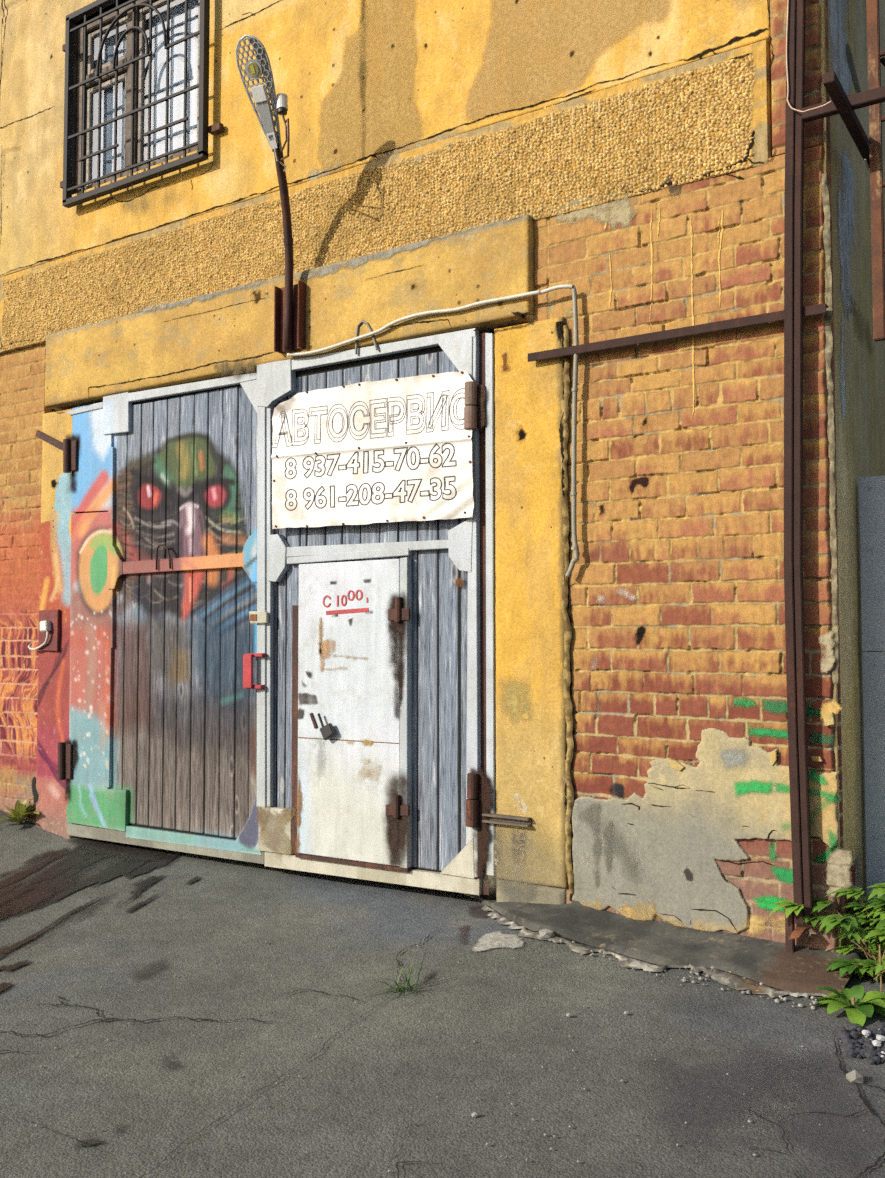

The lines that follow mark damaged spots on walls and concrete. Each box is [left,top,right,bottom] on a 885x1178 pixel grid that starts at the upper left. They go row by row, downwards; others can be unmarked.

crack [0,0,777,275]
crack [46,352,272,408]
spalling [819,173,839,684]
rust [388,595,406,715]
peeling [555,321,792,934]
spalling [821,701,842,726]
rust [386,777,409,865]
peeling [808,756,855,913]
leakage [0,844,182,991]
spalling [462,893,827,998]
crack [36,996,109,1019]